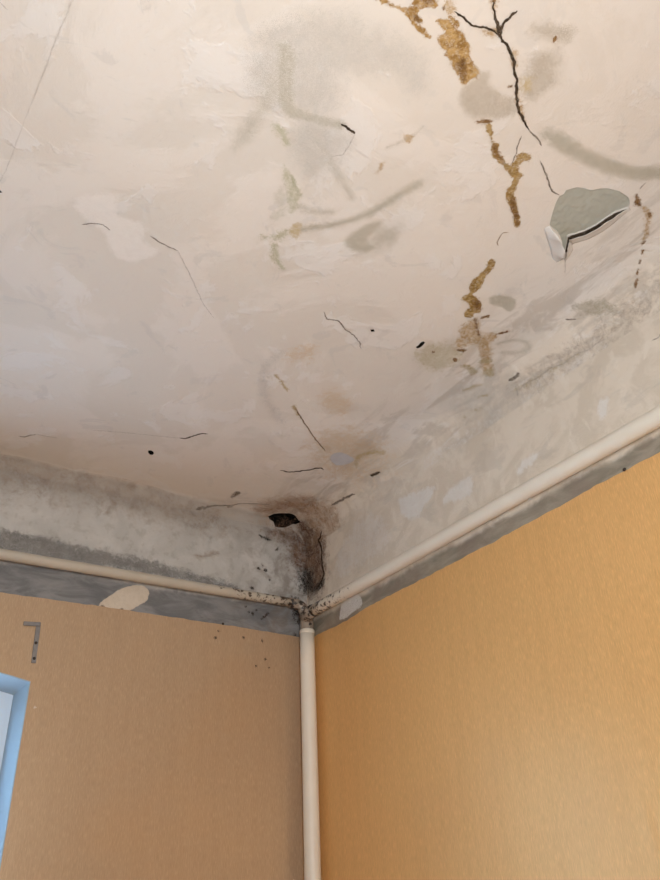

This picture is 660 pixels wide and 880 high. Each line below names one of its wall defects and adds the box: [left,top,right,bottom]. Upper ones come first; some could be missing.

crack [454,0,559,195]
damp [0,528,238,589]
damp [245,492,345,636]